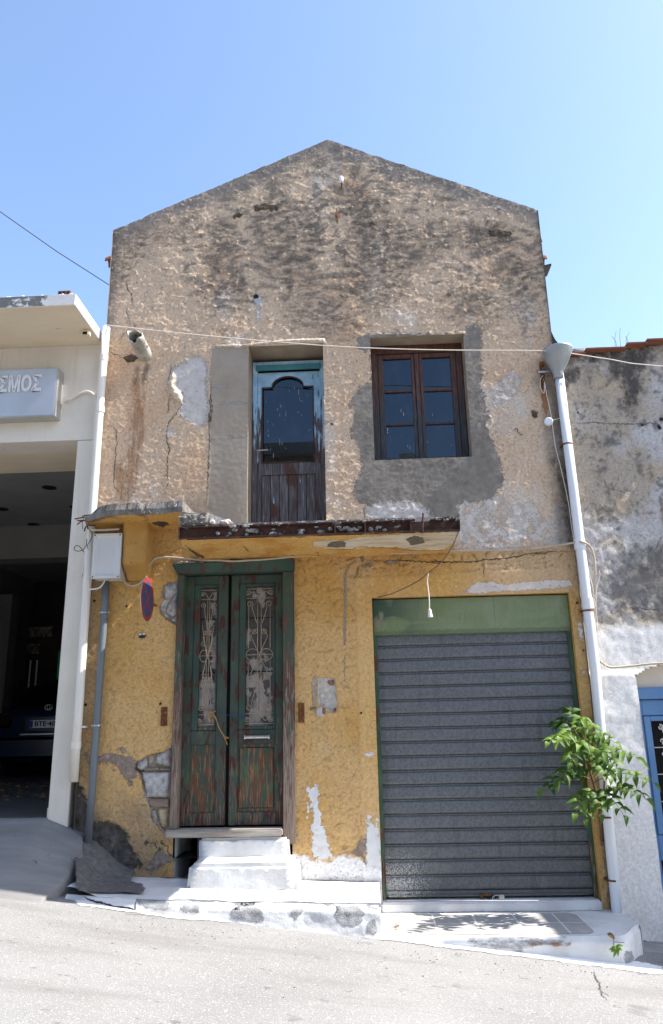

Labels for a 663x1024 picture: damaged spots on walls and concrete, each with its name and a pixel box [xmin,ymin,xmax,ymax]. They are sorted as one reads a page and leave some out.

peeling [167,356,212,426]
crack [165,363,212,502]
spalling [159,581,178,624]
crack [284,547,571,573]
peeling [313,495,551,569]
peeling [454,580,573,595]
spalling [75,747,173,871]
peeling [351,835,367,863]